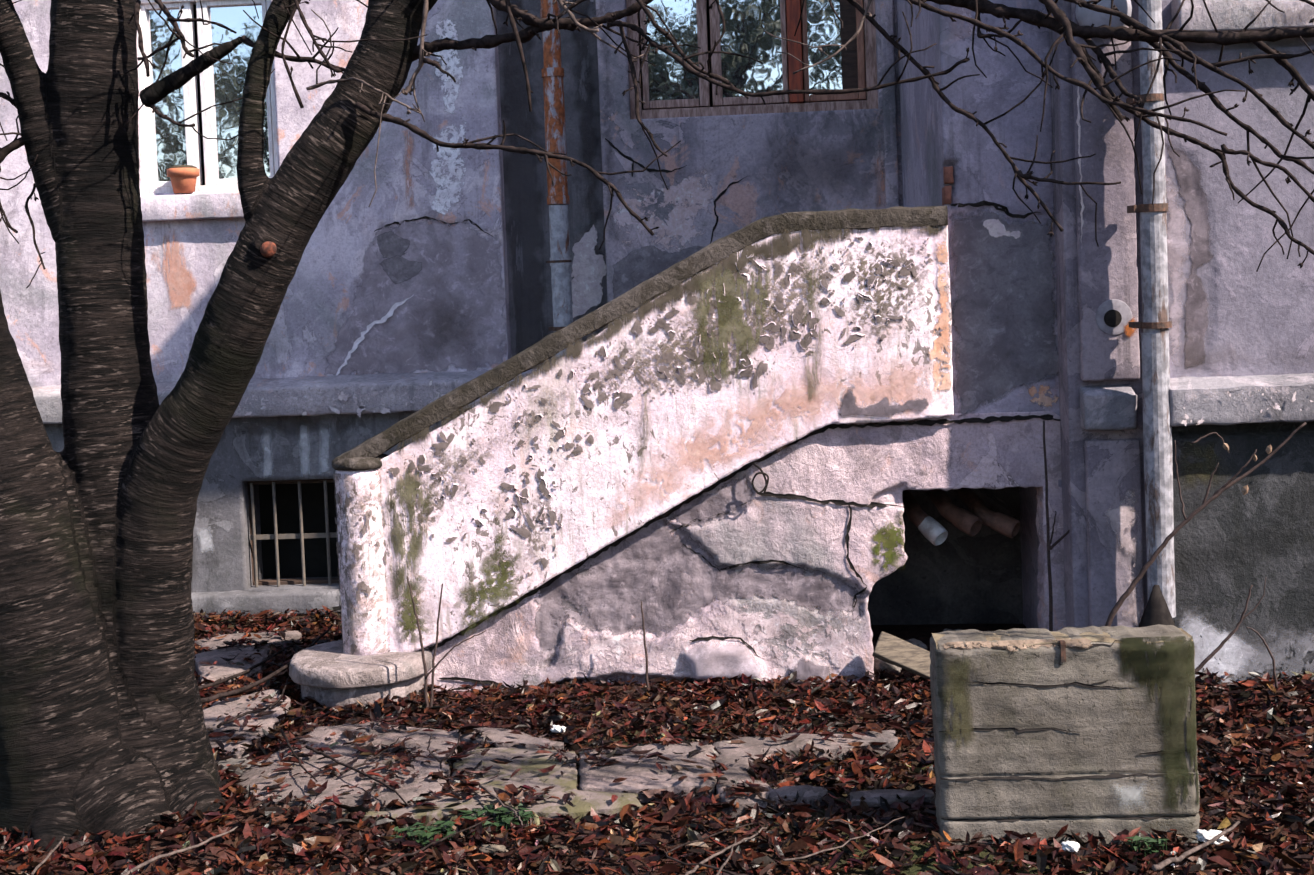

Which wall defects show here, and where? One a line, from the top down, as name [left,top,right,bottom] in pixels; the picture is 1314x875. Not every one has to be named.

spalling [237,19,507,417]
crack [336,294,414,375]
spalling [333,233,934,681]
peeling [571,168,714,318]
crack [428,414,1061,690]
spalling [942,166,1059,415]
water stain [1184,615,1314,683]
water stain [1117,786,1143,805]